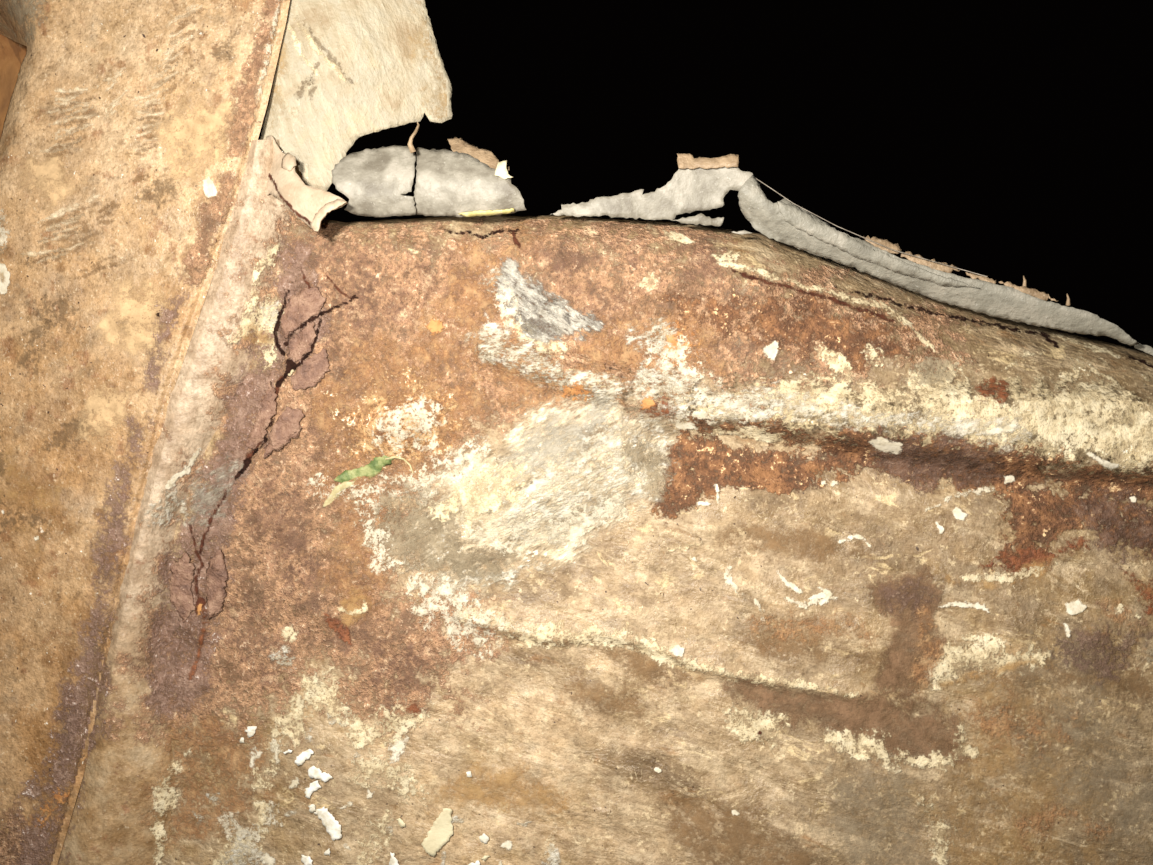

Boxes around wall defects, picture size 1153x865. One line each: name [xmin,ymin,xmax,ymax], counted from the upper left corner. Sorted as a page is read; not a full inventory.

peeling [258,0,527,232]
peeling [550,153,1153,355]
peeling [764,341,779,360]
peeling [814,342,852,376]
peeling [860,343,885,367]
crack [189,270,358,680]
peeling [675,421,698,430]
peeling [716,426,785,443]
peeling [869,437,903,454]
peeling [1087,452,1119,469]
corrosion [0,200,1153,865]
water stain [723,673,970,764]